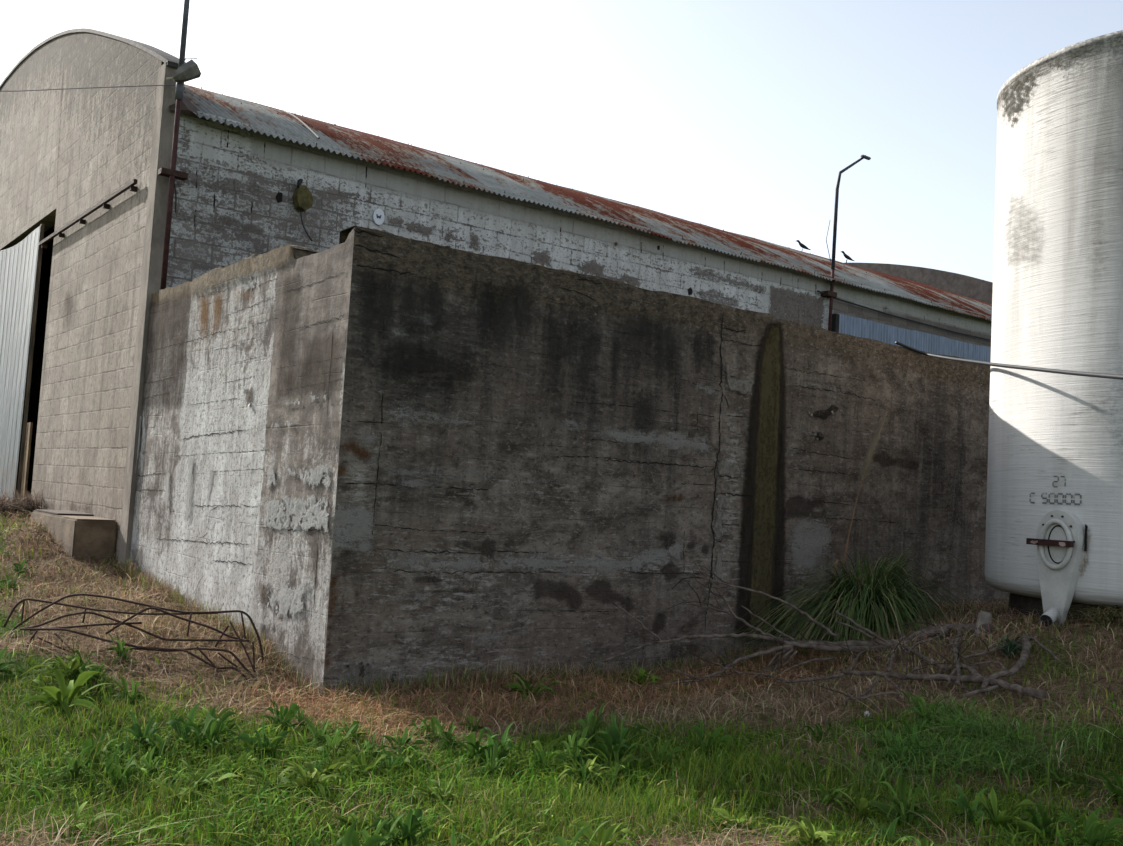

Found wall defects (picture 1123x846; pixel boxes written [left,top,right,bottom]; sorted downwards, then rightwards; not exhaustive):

leakage [1001,50,1091,129]
peeling [388,216,454,245]
peeling [467,233,481,251]
peeling [531,250,552,268]
peeling [577,260,642,287]
peeling [688,266,824,327]